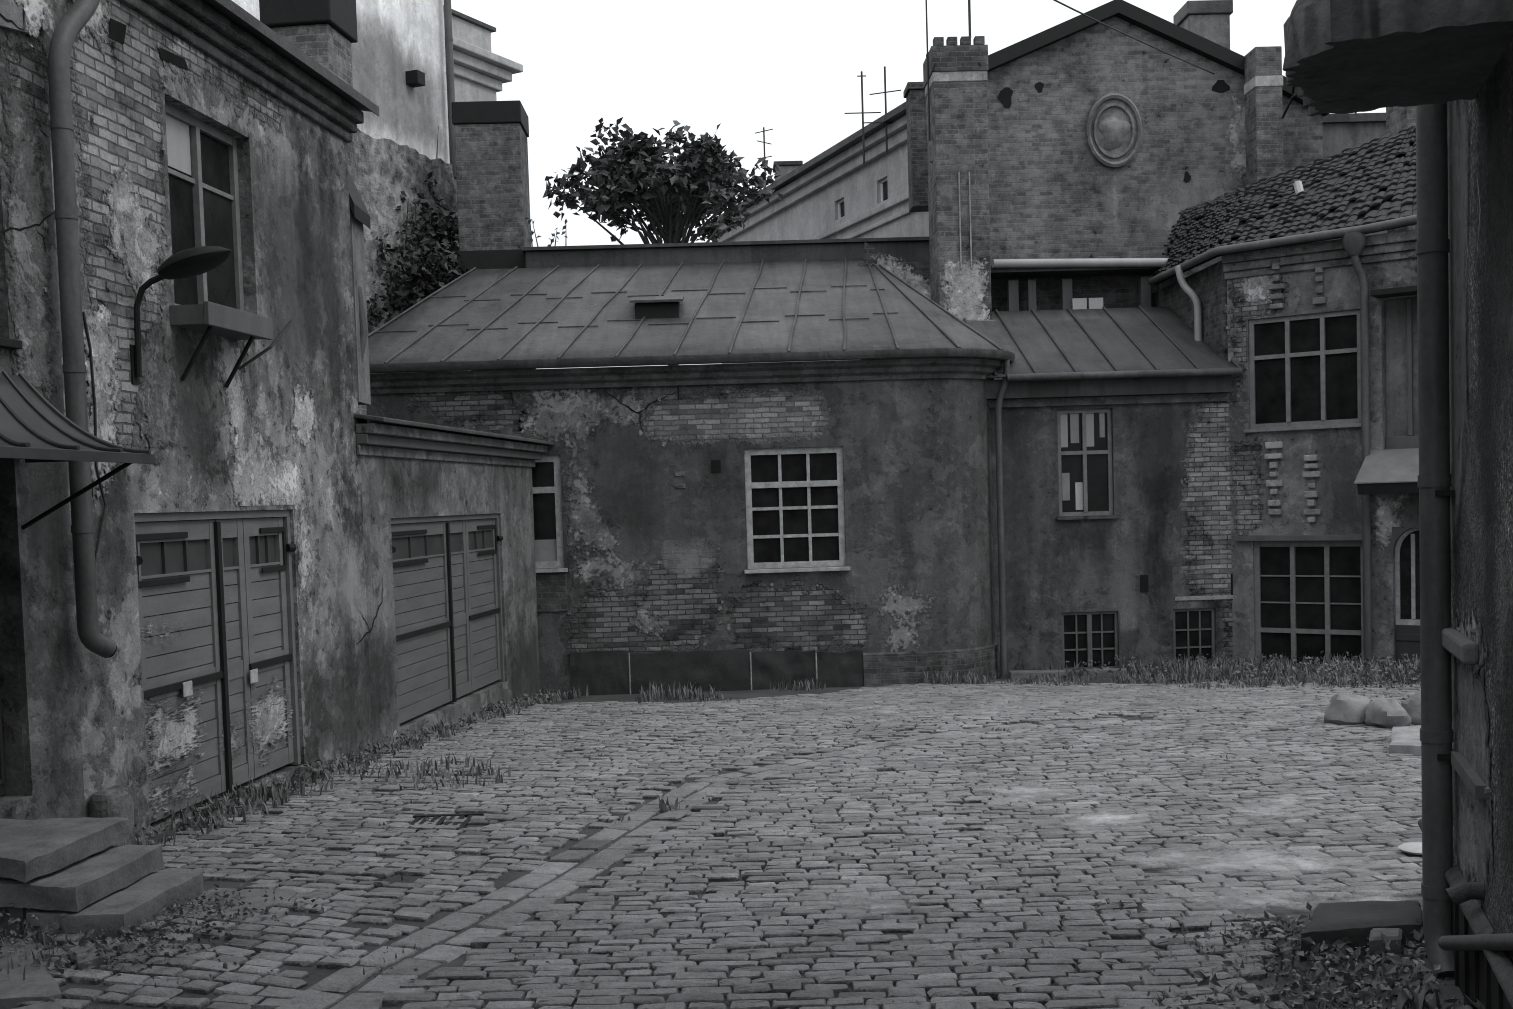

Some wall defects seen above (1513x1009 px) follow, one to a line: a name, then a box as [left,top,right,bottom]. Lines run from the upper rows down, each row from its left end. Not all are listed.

crack [0,5,25,33]
peeling [0,0,75,402]
spalling [70,0,286,506]
spalling [404,384,938,660]
peeling [144,674,294,826]